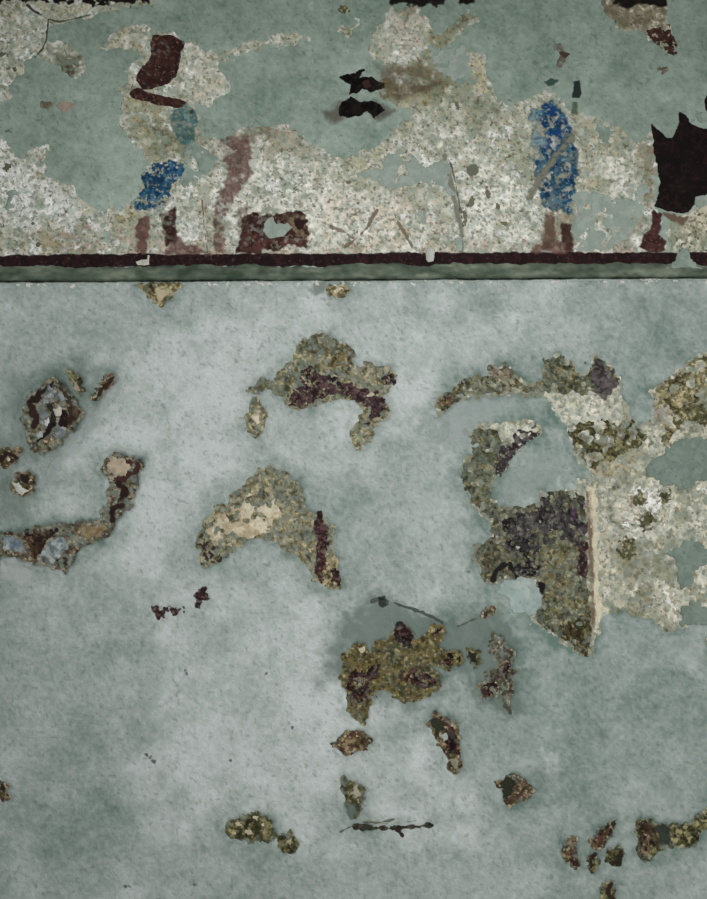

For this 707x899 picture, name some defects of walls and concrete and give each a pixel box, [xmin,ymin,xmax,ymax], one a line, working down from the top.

peeling [0,0,707,266]
spalling [0,369,119,497]
spalling [244,333,397,451]
spalling [0,452,144,575]
spalling [195,465,342,590]
peeling [620,486,672,540]
spalling [225,811,300,854]
spalling [330,621,517,756]
spalling [426,710,463,775]
spalling [494,773,536,809]
spalling [559,820,625,874]
spalling [634,808,707,863]